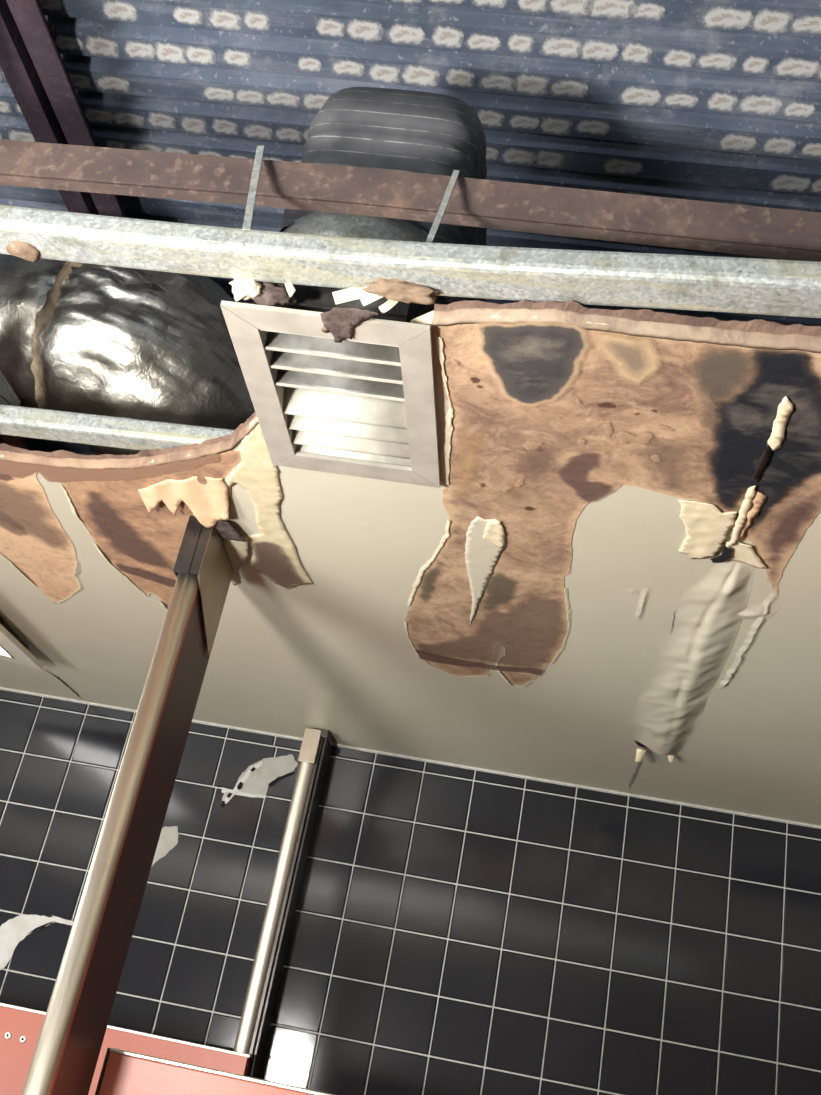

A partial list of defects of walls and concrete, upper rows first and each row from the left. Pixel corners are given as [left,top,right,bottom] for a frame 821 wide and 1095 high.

rust [56,35,251,66]
rust [298,57,588,98]
rust [85,108,309,142]
rust [204,87,329,110]
rust [478,109,610,135]
rust [621,86,815,117]
rust [720,134,821,157]
damp [476,322,659,406]
damp [693,351,821,528]
peeling [0,412,259,610]
peeling [404,300,821,687]
damp [769,502,811,561]